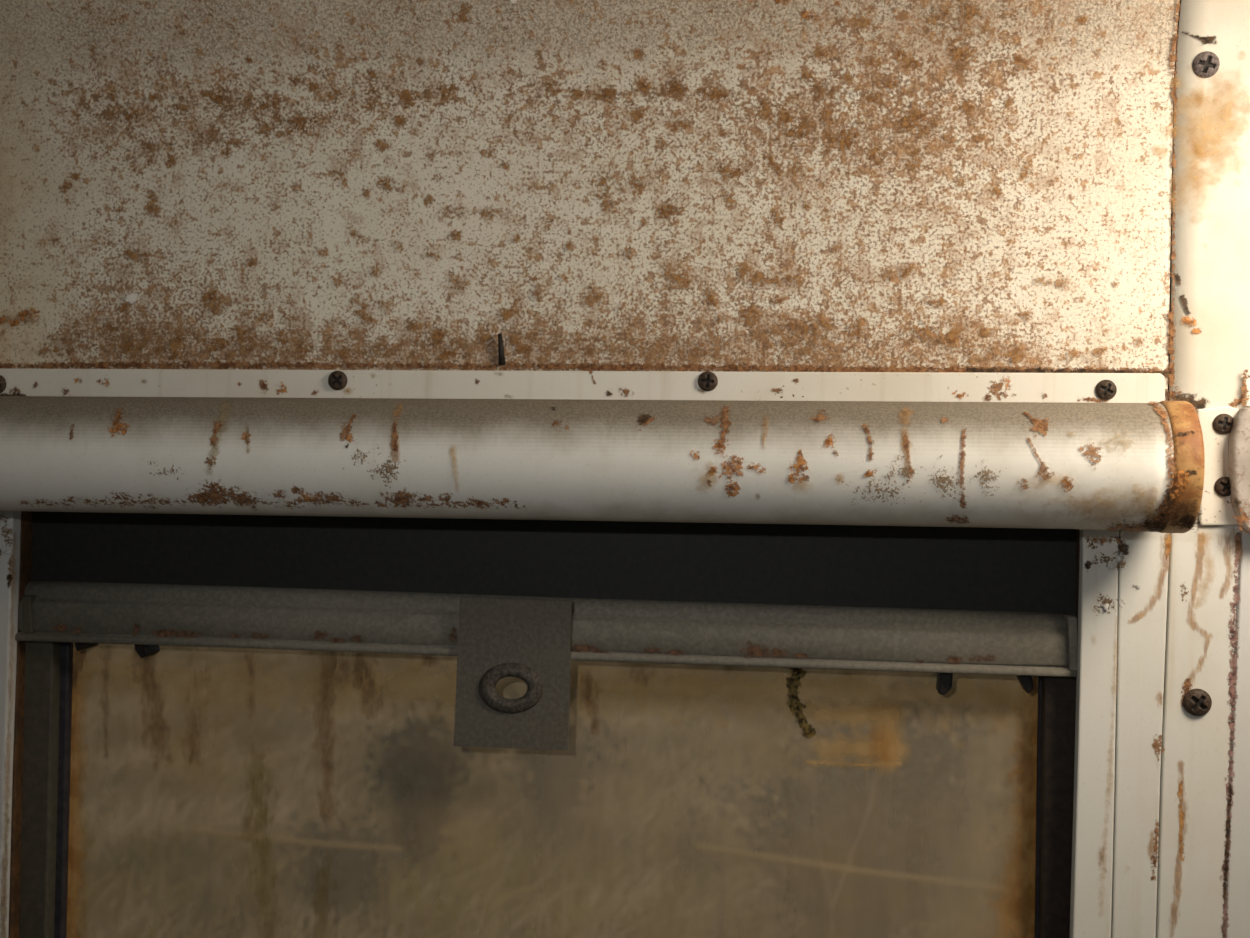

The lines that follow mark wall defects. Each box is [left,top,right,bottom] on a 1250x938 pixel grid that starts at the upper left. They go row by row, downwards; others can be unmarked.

corrosion [918,0,998,73]
corrosion [78,82,332,168]
corrosion [290,71,461,128]
corrosion [543,79,746,152]
corrosion [703,48,956,207]
corrosion [425,195,500,241]
corrosion [587,174,645,213]
corrosion [641,199,685,227]
corrosion [0,263,1208,622]
corrosion [1152,734,1165,761]
corrosion [1220,498,1250,938]
corrosion [1172,763,1185,923]